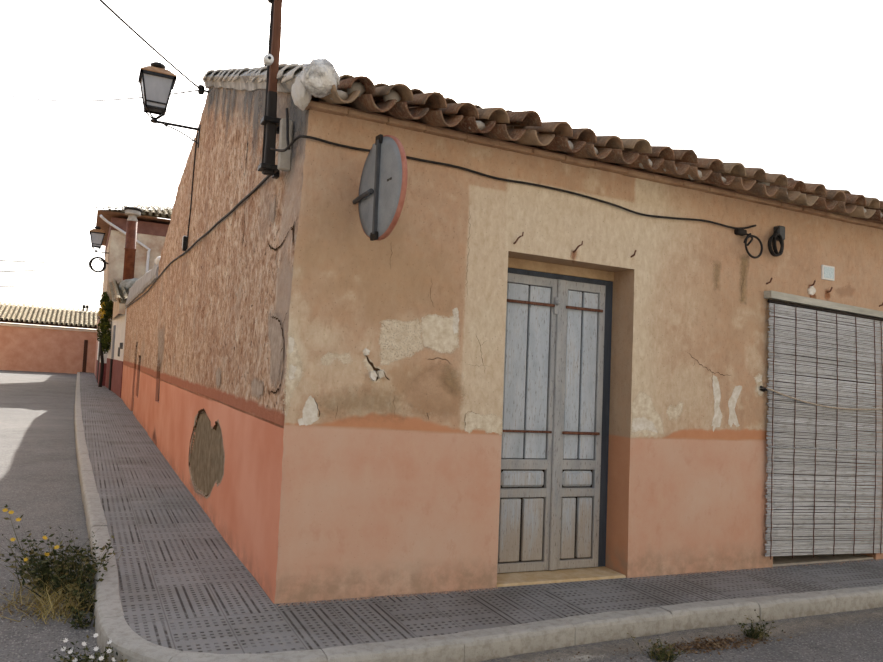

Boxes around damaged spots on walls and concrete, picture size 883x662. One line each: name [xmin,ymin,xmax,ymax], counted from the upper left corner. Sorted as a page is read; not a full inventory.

crack [269,313,287,394]
flaking render [282,334,306,415]
flaking render [298,395,320,426]
flaking render [321,308,460,384]
flaking render [631,390,683,437]
peeling [712,375,742,432]
flaking render [754,373,763,397]
flaking render [188,408,225,499]